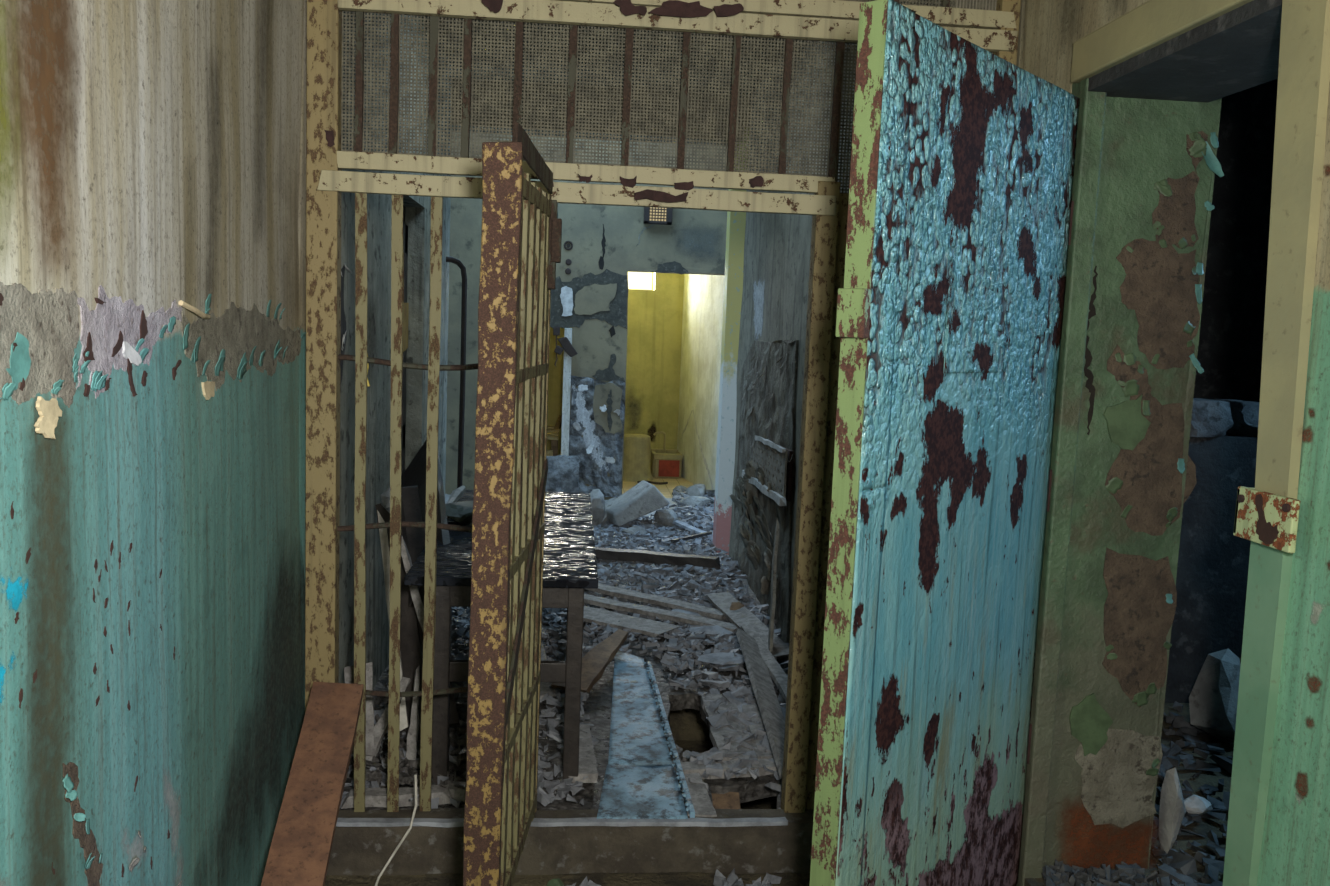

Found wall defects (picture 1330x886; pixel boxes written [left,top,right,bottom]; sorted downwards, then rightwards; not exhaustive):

peeling [0,282,306,439]